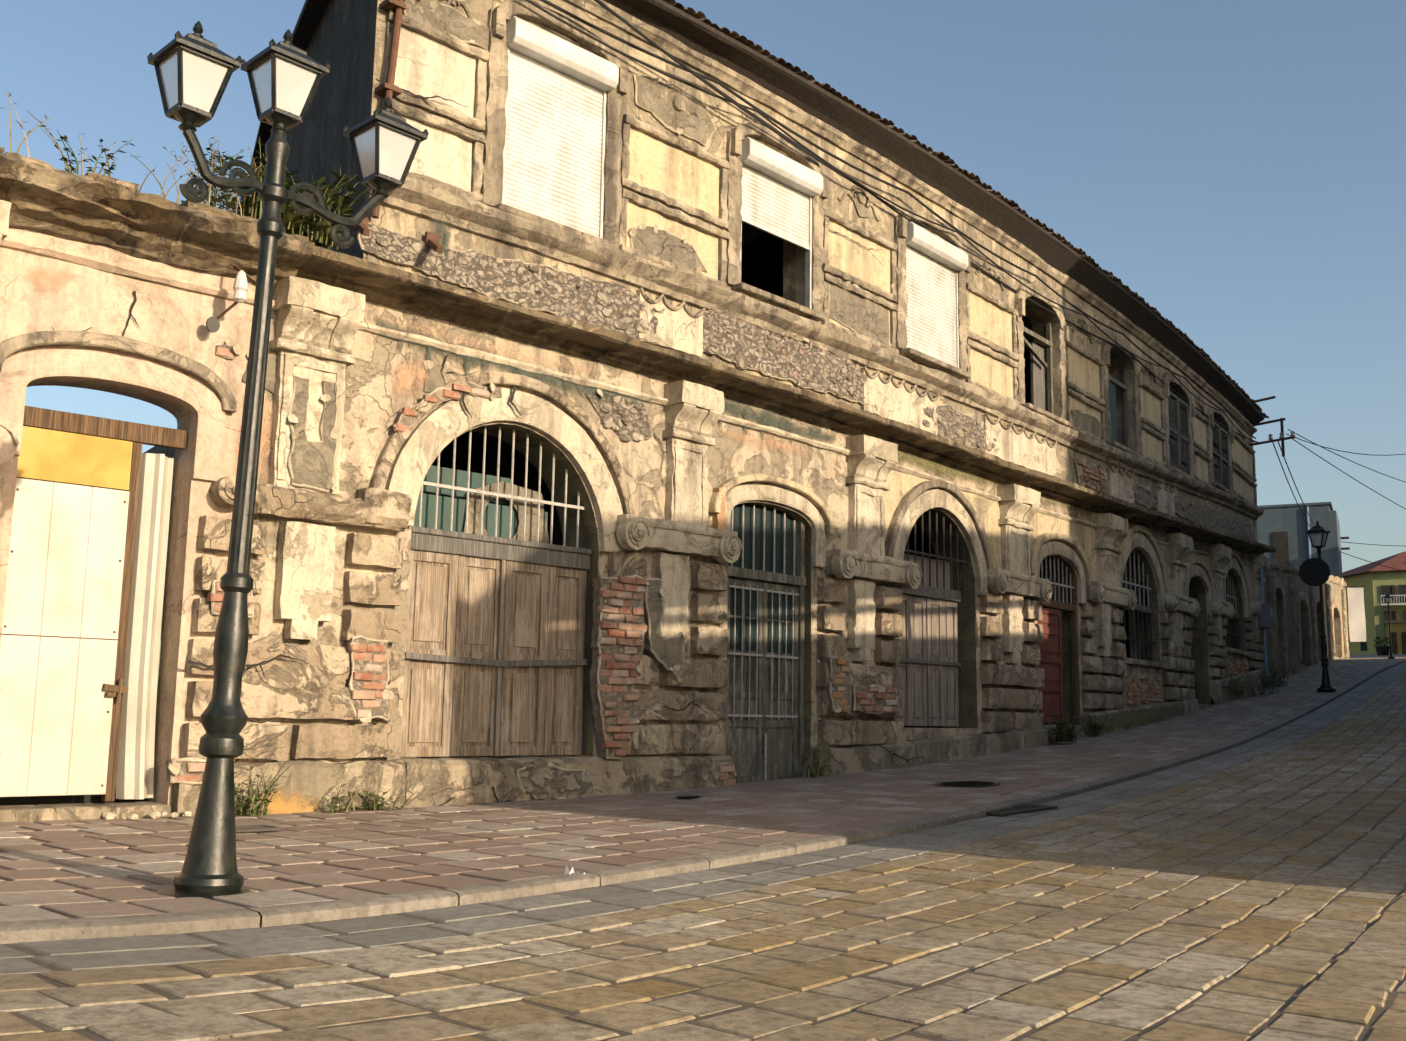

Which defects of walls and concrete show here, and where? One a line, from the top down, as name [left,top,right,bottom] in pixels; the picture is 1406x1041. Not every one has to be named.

crack [40,290,140,347]
spalling [389,360,503,439]
spalling [207,579,224,615]
spalling [517,575,686,800]
spalling [822,655,900,715]
spalling [166,758,206,785]